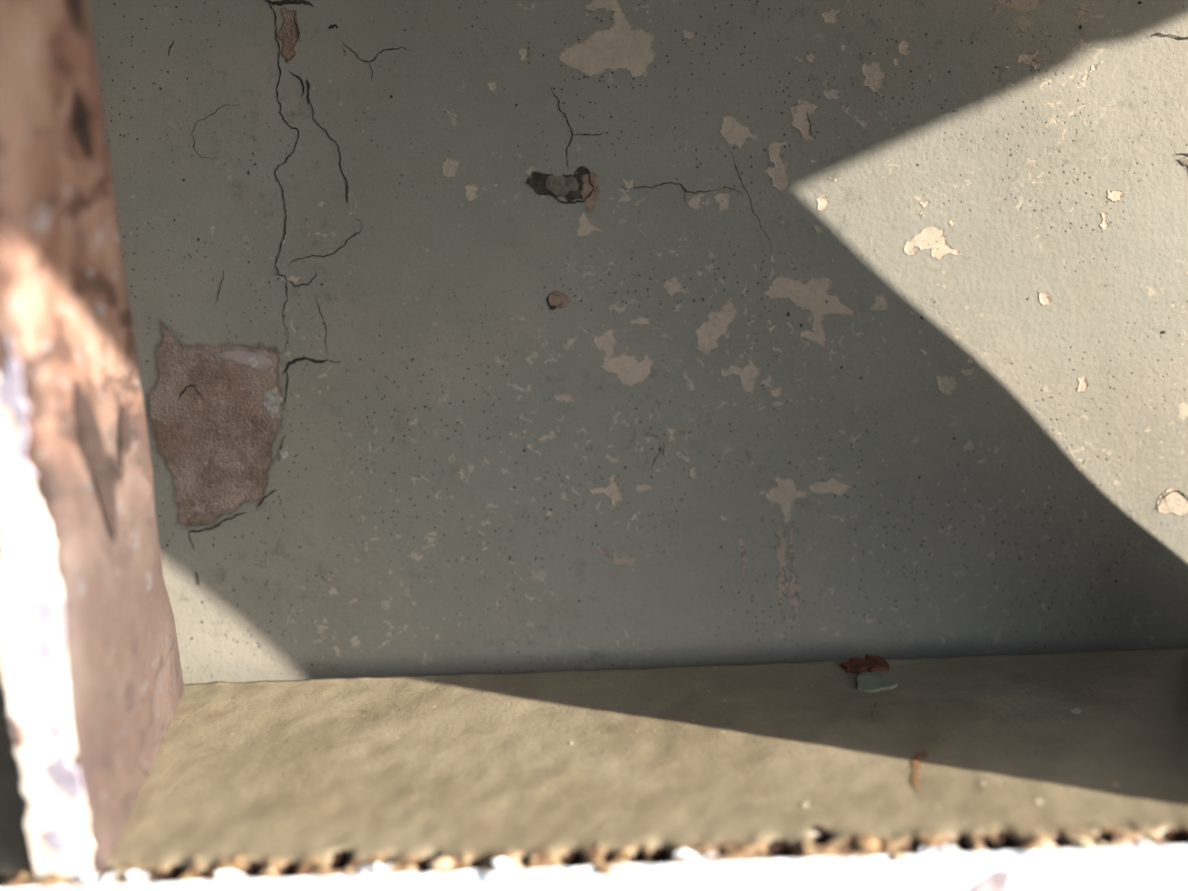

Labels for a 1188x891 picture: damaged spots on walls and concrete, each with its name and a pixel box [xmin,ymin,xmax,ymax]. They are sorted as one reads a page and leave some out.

peeling [559,0,656,78]
crack [191,105,236,159]
crack [265,0,413,406]
crack [635,182,745,201]
crack [187,490,276,585]
peeling [0,405,296,891]
spalling [330,850,391,880]
spalling [418,853,536,875]
spalling [561,844,723,876]
spalling [768,839,795,859]
spalling [982,830,1020,852]
spalling [1129,829,1188,849]